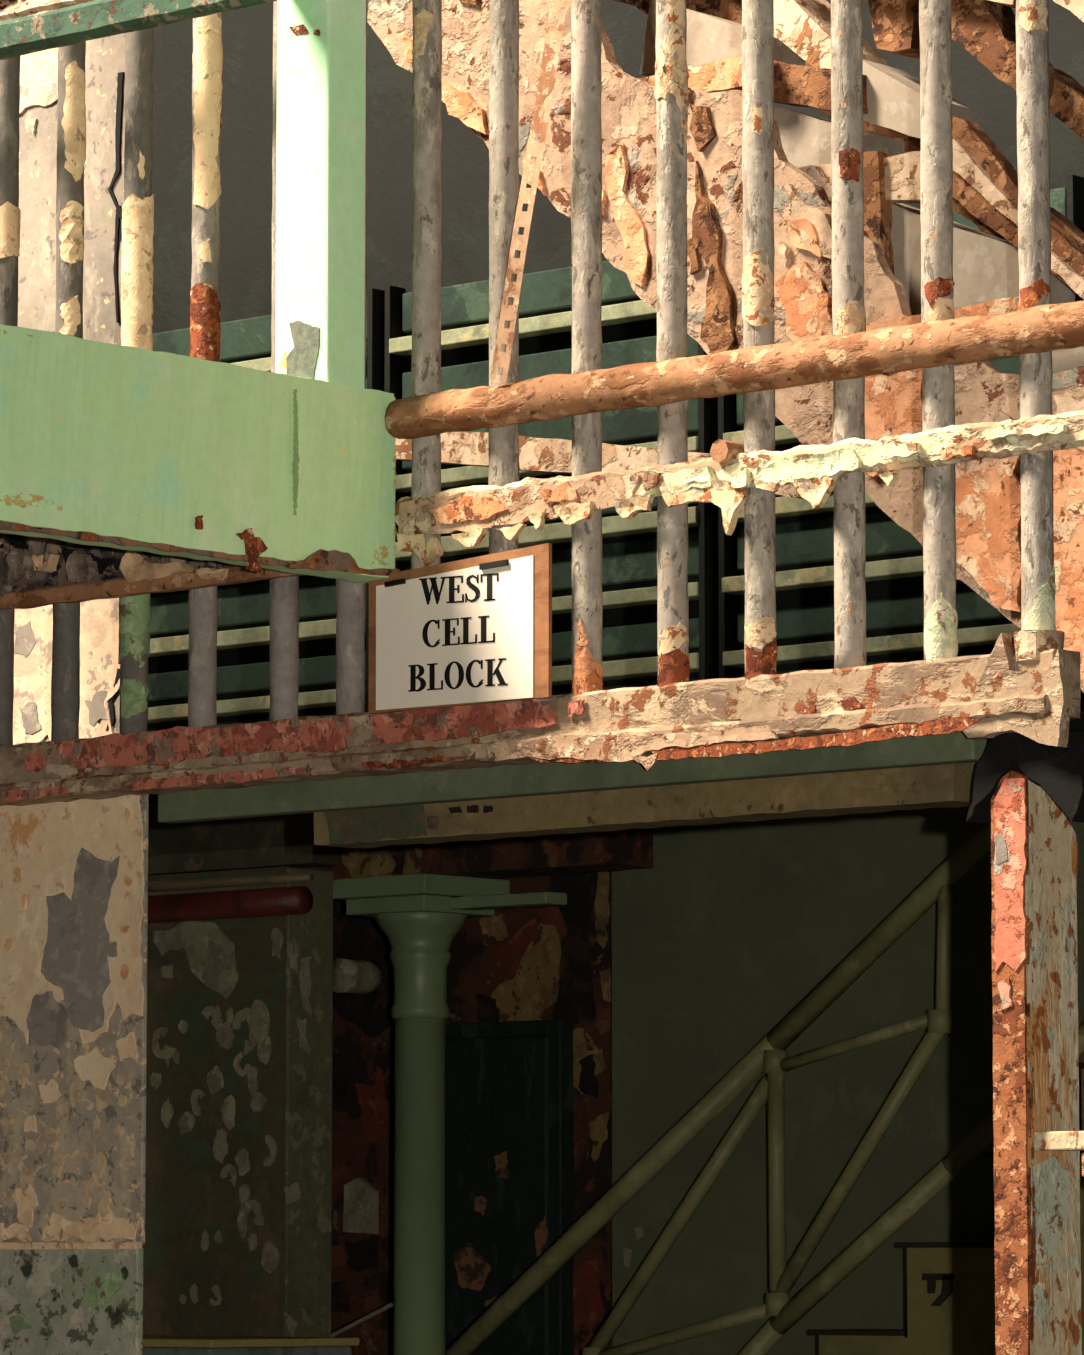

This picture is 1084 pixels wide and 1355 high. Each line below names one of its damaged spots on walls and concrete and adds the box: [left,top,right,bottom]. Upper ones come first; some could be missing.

peeling [19,48,87,182]
corrosion [839,148,861,182]
peeling [121,194,154,351]
corrosion [190,283,221,362]
peeling [397,368,923,566]
peeling [955,386,1084,680]
peeling [0,537,778,772]
corrosion [572,619,604,696]
corrosion [657,622,690,687]
corrosion [744,617,778,681]
corrosion [650,717,983,760]
peeling [0,795,279,1274]